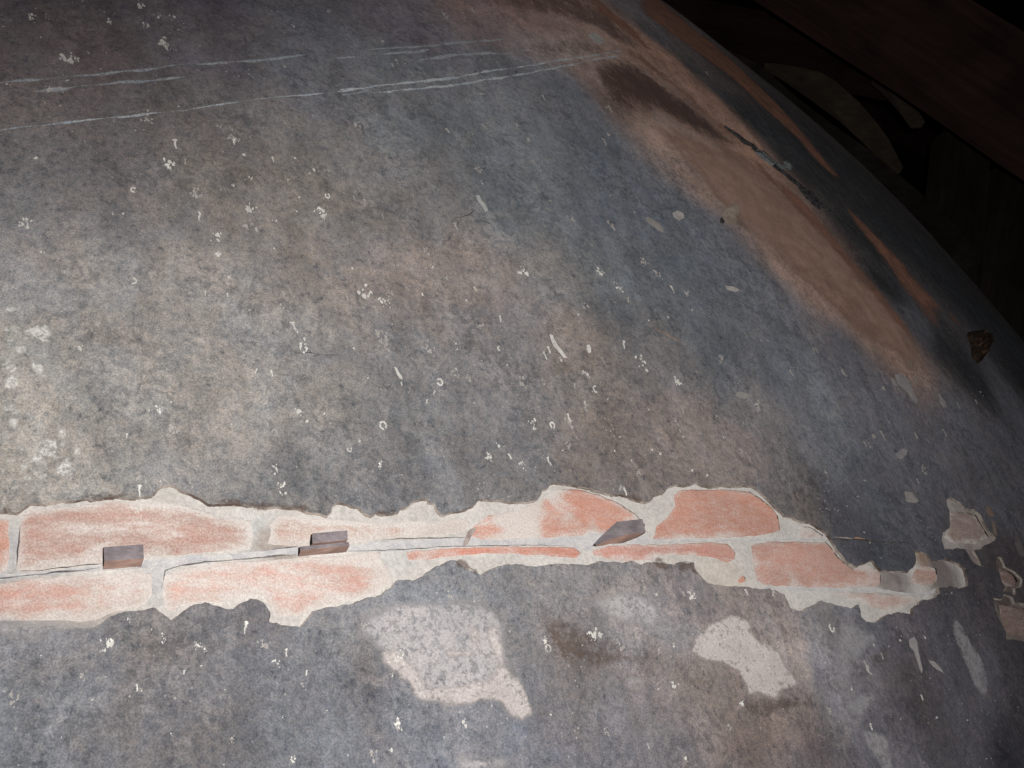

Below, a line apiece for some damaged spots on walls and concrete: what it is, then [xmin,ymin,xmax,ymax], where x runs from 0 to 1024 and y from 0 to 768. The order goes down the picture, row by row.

corrosion [642,0,835,175]
corrosion [664,130,916,361]
corrosion [849,210,938,319]
flaking render [0,482,997,630]
flaking render [993,557,1024,642]